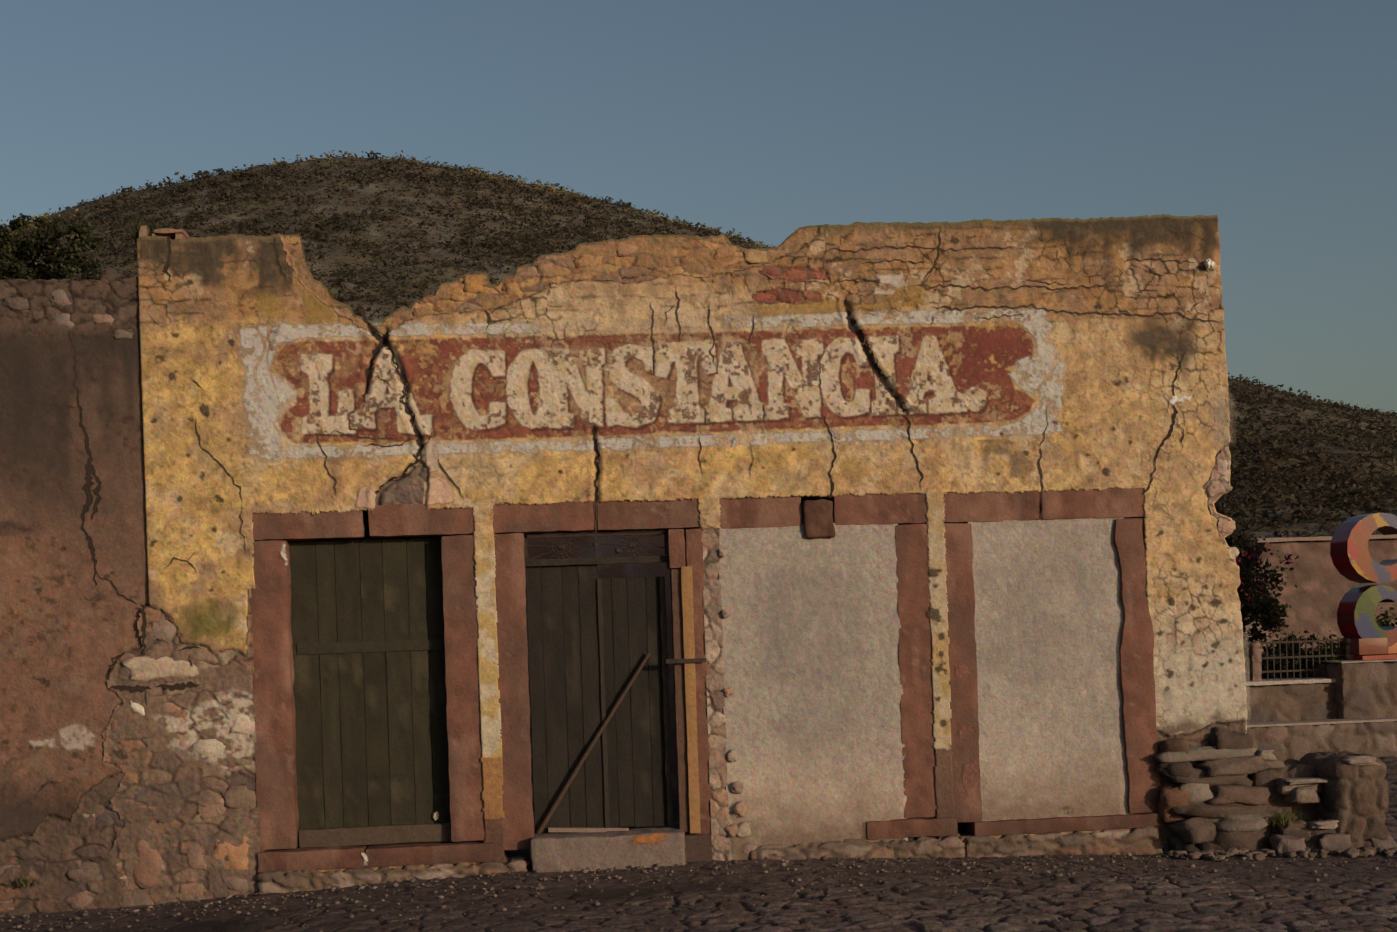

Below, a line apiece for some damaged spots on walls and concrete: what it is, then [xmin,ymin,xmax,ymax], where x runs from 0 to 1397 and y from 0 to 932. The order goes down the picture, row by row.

crack [40,331,201,706]
crack [317,309,464,505]
spalling [356,440,454,509]
crack [592,429,603,531]
crack [824,226,1218,498]
crack [1038,409,1048,519]
water stain [1133,323,1195,359]
spalling [1203,446,1239,563]
spalling [1159,568,1228,636]
spalling [0,589,260,917]